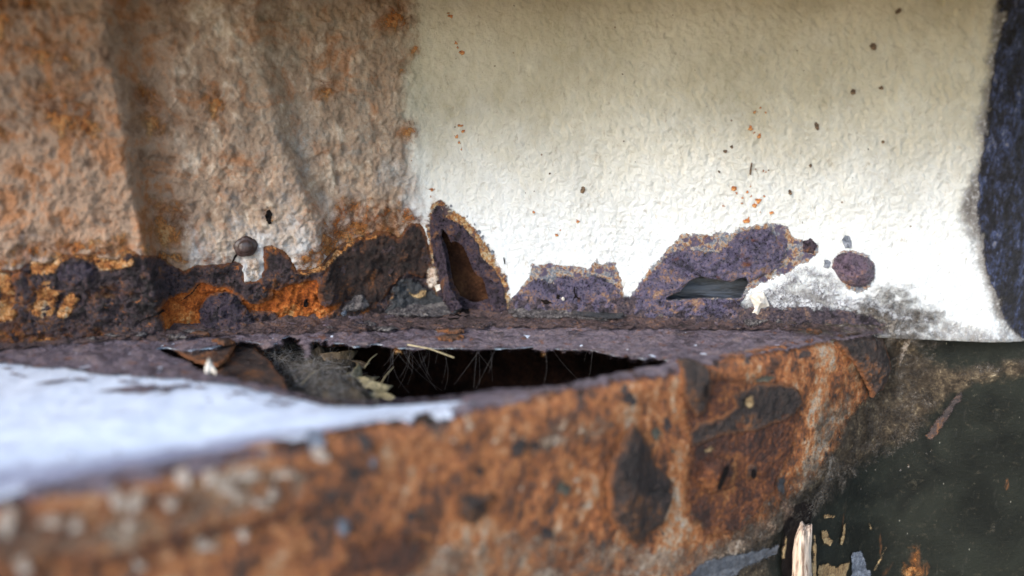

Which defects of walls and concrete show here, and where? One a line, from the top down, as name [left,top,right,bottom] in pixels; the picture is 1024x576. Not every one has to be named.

rust [24,84,102,140]
peeling [204,357,216,375]
rust [0,186,891,576]